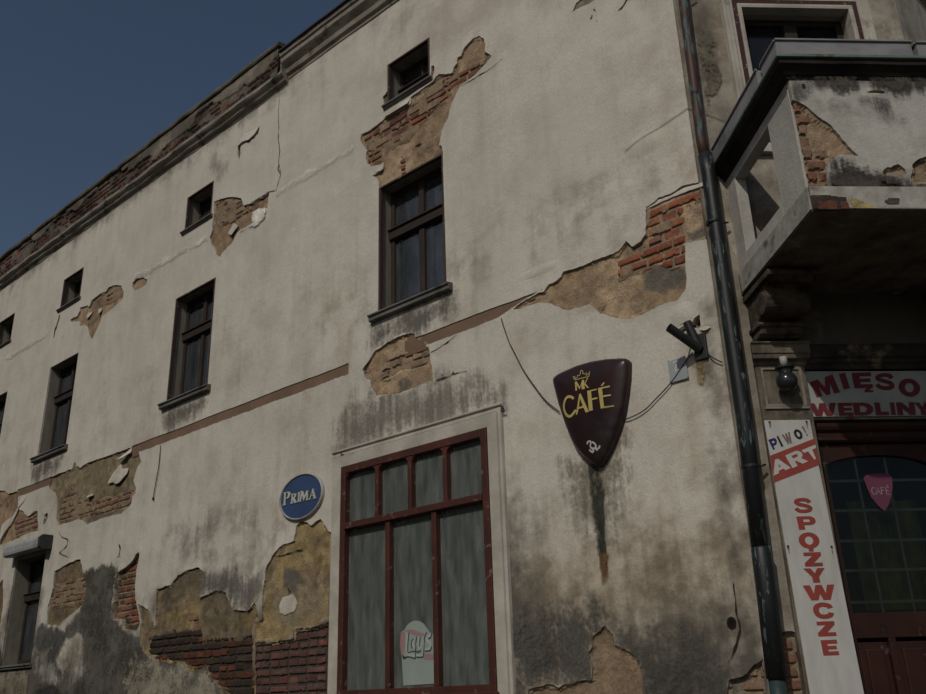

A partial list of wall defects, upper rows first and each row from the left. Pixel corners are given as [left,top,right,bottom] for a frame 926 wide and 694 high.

crack [251,92,281,203]
spalling [361,36,491,187]
spalling [793,101,900,209]
spalling [211,194,269,257]
spalling [519,182,706,319]
spalling [71,277,147,339]
spalling [0,448,142,545]
leakage [570,439,626,582]
spalling [47,559,86,626]
leakage [31,563,149,694]
spalling [113,520,331,694]
leakage [202,564,262,610]